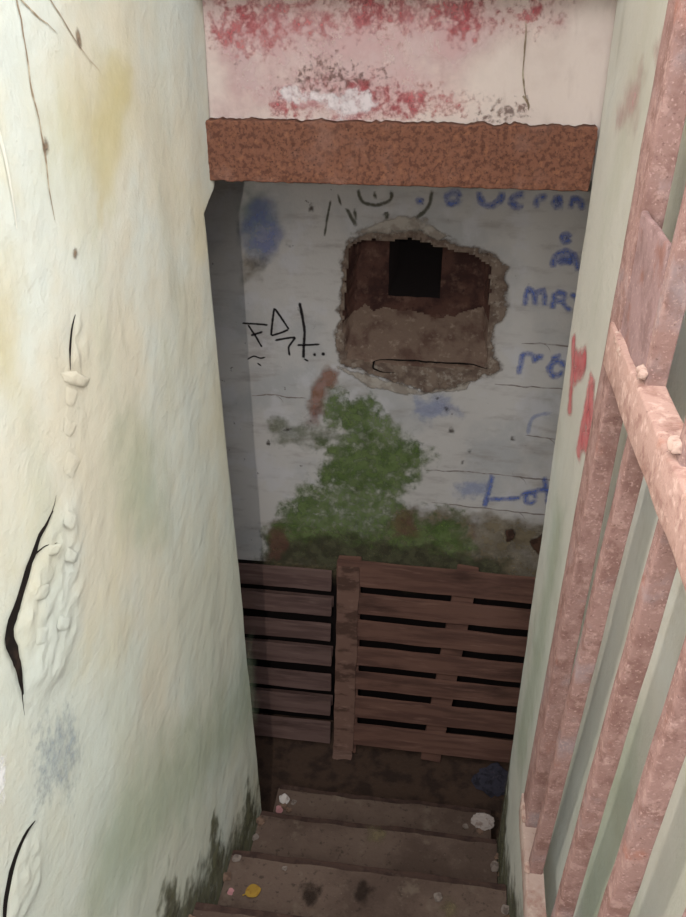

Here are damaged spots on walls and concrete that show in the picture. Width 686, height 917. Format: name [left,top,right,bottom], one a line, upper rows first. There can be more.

crack [68,315,76,370]
spalling [334,216,509,395]
crack [5,498,56,715]
crack [3,821,35,917]